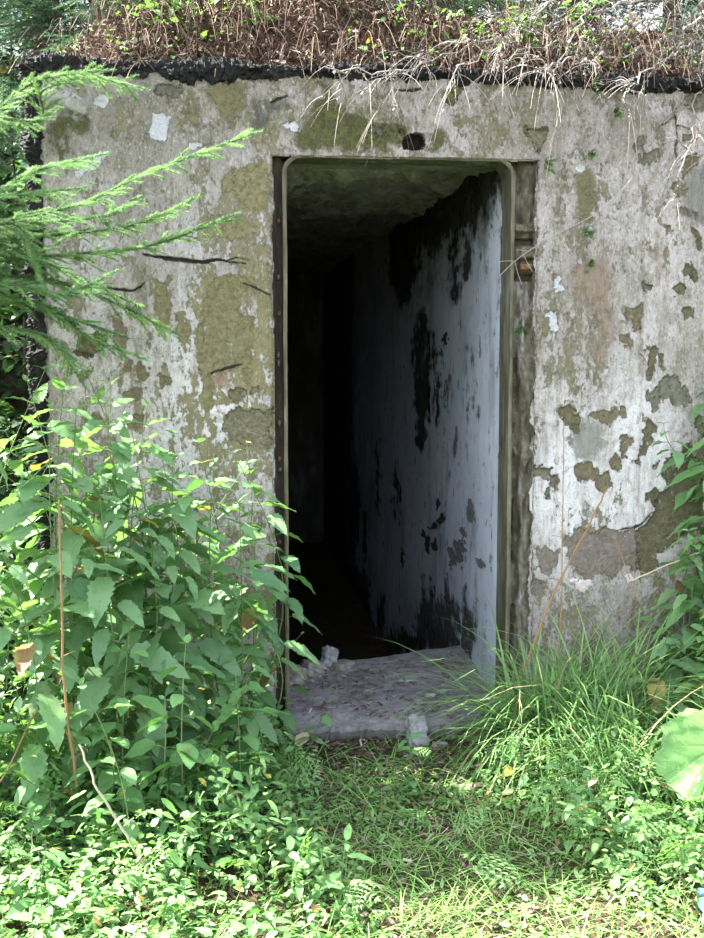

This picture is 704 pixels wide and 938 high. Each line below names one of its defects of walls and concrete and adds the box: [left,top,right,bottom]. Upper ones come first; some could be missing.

leakage [316,81,336,106]
crack [143,253,271,295]
leakage [385,170,502,309]
peeling [673,263,698,297]
peeling [123,360,171,401]
peeling [155,275,276,449]
crack [210,364,241,374]
leakage [411,306,451,454]
peeling [559,400,627,434]
peeling [574,346,693,493]
leakage [348,440,478,659]
peeling [528,443,704,598]